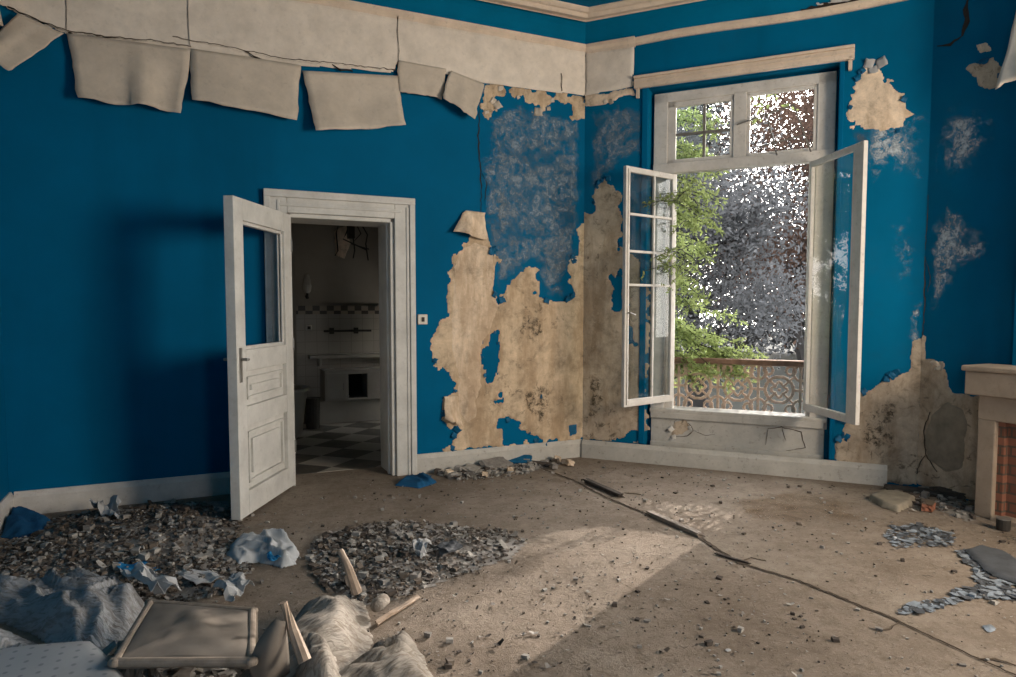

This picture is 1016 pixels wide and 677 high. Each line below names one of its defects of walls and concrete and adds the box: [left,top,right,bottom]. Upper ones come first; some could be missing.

spalling [846,55,914,163]
spalling [966,43,1002,89]
flaking render [430,84,651,452]
flaking render [835,335,979,500]
crack [539,467,652,517]
crack [678,528,1016,675]